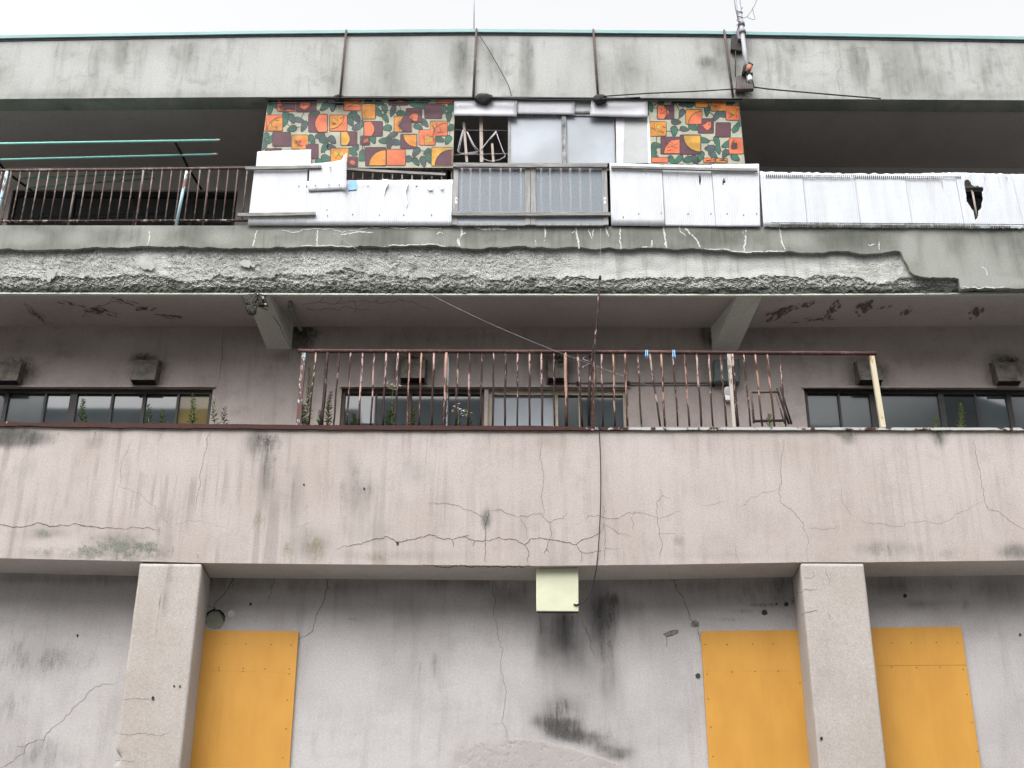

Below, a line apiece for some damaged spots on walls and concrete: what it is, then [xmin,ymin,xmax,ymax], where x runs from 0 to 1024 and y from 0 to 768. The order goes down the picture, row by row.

peeling [41,270,62,282]
crack [0,522,154,530]
crack [741,435,1015,620]
crack [339,438,679,753]
crack [7,681,140,765]